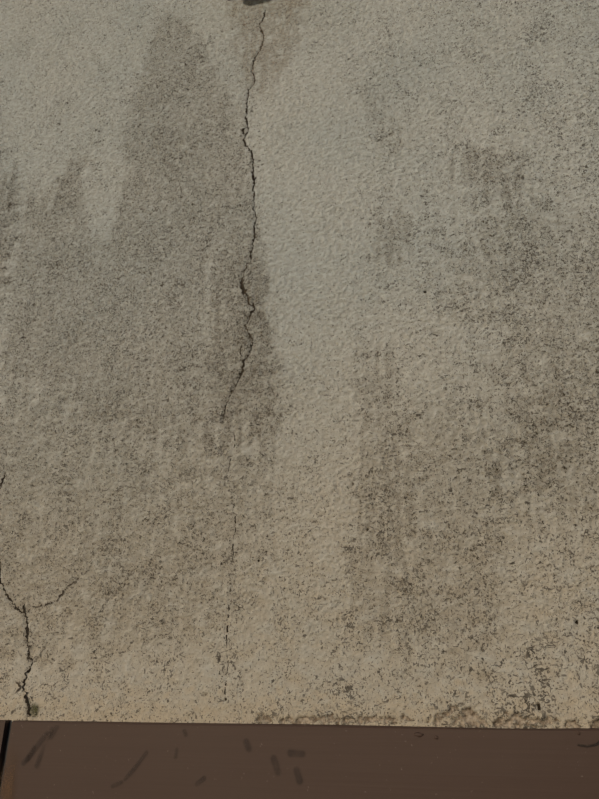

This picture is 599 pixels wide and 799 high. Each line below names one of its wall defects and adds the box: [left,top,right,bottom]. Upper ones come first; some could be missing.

crack [0,561,89,716]
water stain [0,17,283,668]
crack [222,7,267,471]
water stain [347,146,599,675]